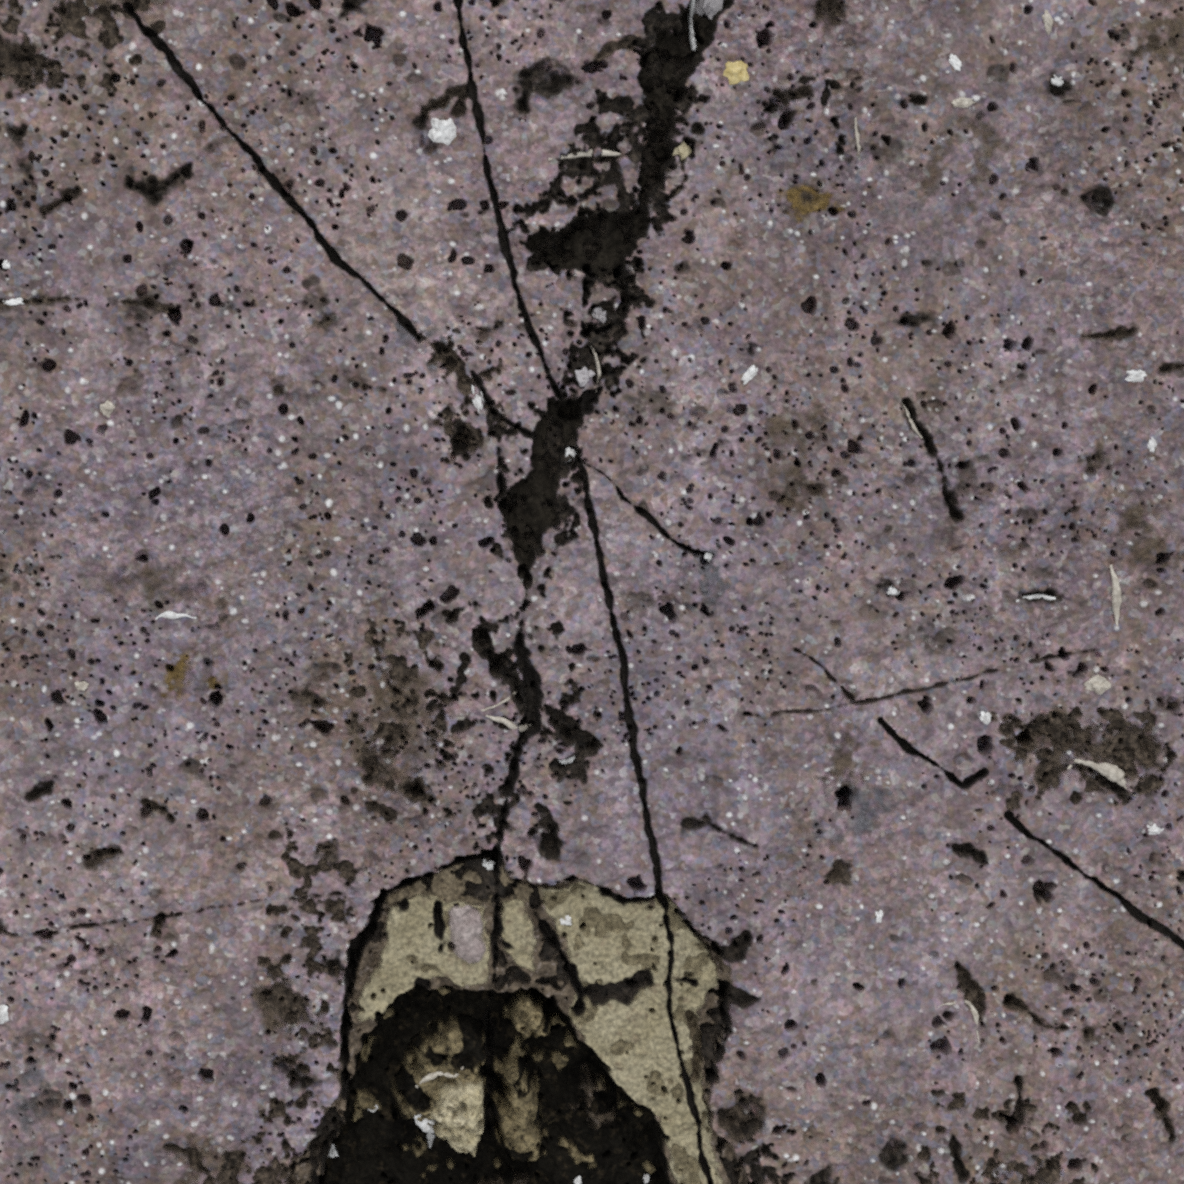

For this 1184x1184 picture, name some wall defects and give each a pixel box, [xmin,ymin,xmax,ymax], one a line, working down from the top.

hole [512,59,579,114]
peeling [548,149,621,161]
crack [123,0,734,1184]
crack [1030,649,1096,663]
crack [744,648,998,789]
spalling [681,815,758,848]
crack [1004,811,1184,949]
spalling [151,912,165,939]
crack [0,892,342,937]
spalling [164,823,795,1184]
spalling [810,1165,839,1184]